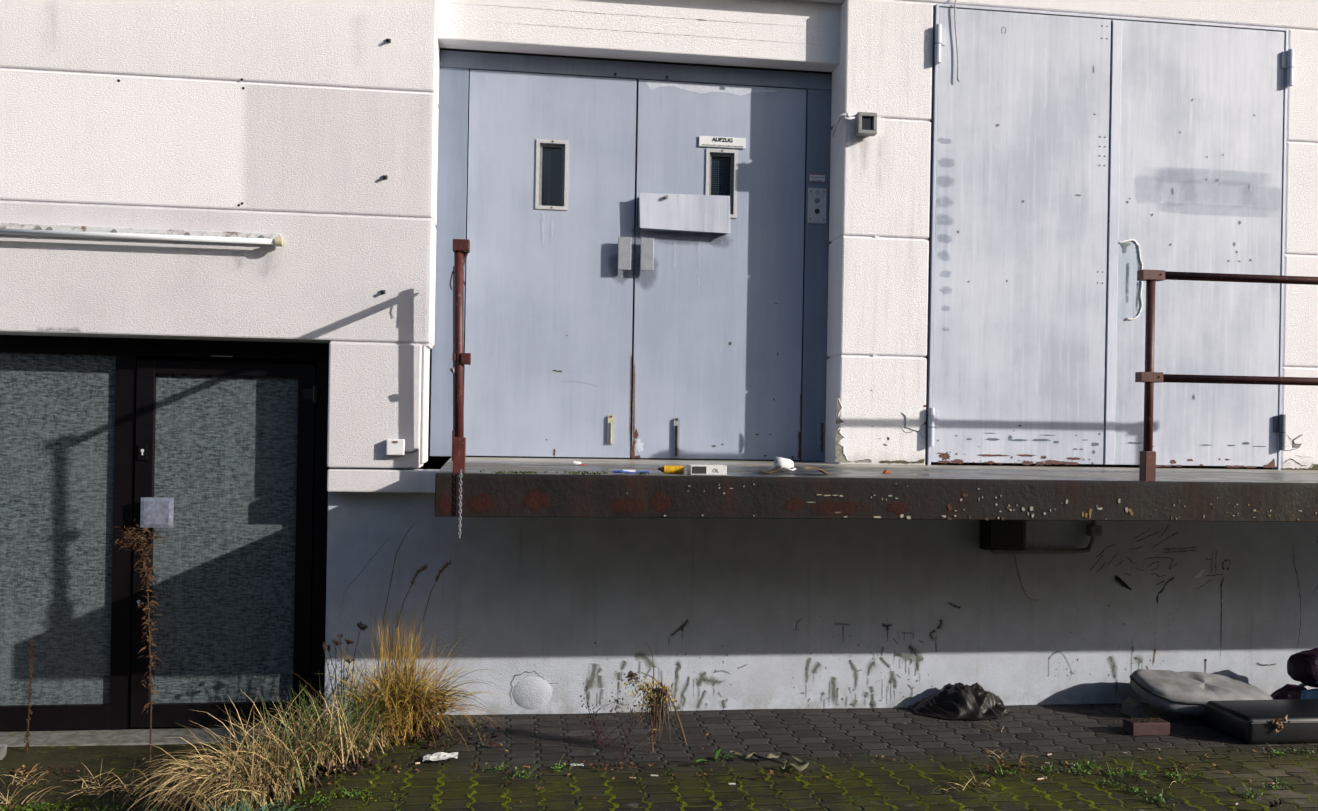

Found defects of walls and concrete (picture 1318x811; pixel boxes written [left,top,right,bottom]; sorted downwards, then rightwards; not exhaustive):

peeling [835,397,1093,466]
peeling [1219,458,1318,470]